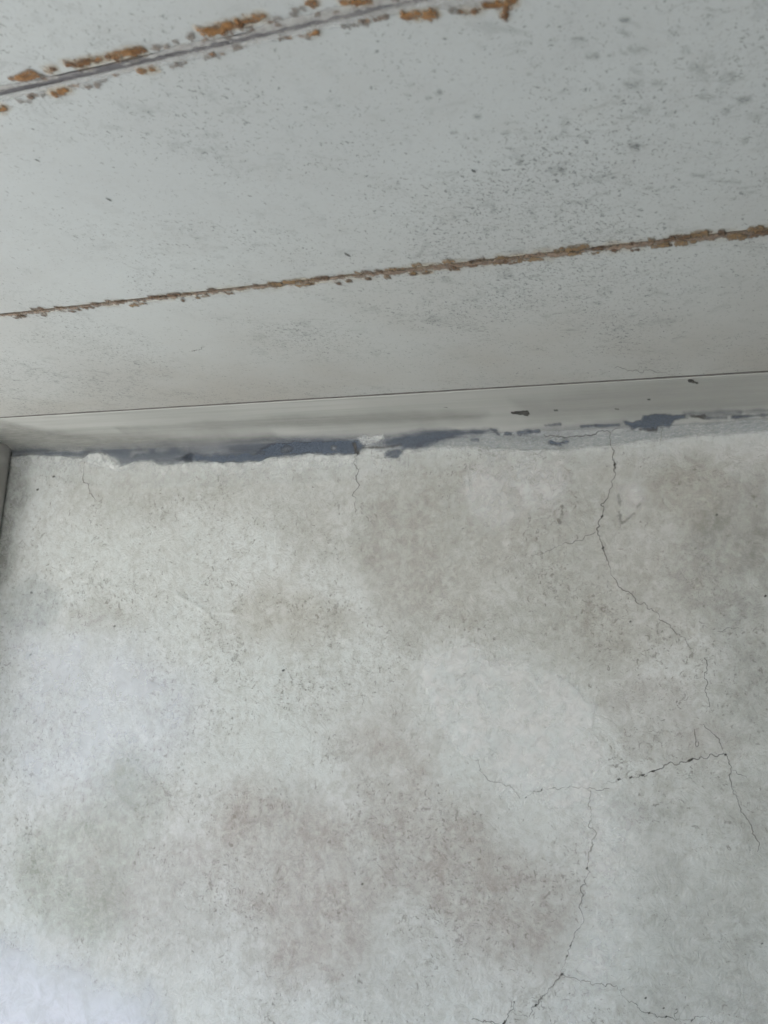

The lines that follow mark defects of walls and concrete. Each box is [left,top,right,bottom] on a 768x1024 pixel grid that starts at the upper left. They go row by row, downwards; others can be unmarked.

corrosion [335,0,372,13]
corrosion [353,0,518,27]
corrosion [188,14,273,42]
corrosion [8,46,169,82]
corrosion [21,88,69,103]
corrosion [1,225,768,319]
flaking render [182,458,268,468]
crack [551,428,662,621]
crack [477,726,740,1024]